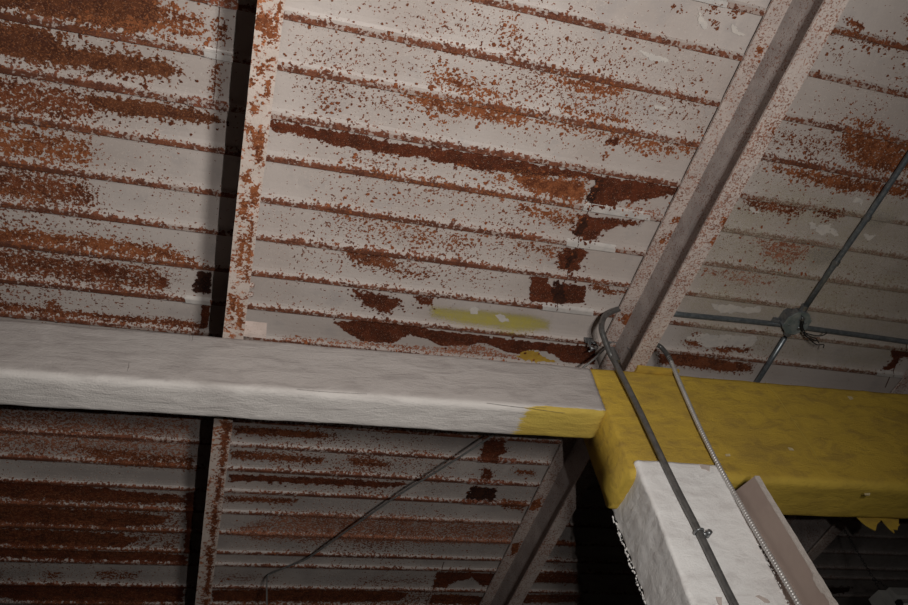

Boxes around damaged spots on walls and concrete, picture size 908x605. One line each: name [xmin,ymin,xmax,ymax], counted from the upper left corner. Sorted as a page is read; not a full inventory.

corrosion [701,2,745,31]
corrosion [817,14,908,86]
corrosion [0,0,236,333]
corrosion [232,0,721,310]
corrosion [701,109,908,298]
corrosion [227,293,246,332]
corrosion [275,288,596,365]
corrosion [654,331,757,376]
corrosion [880,348,908,374]
corrosion [0,421,545,605]
corrosion [522,571,584,605]